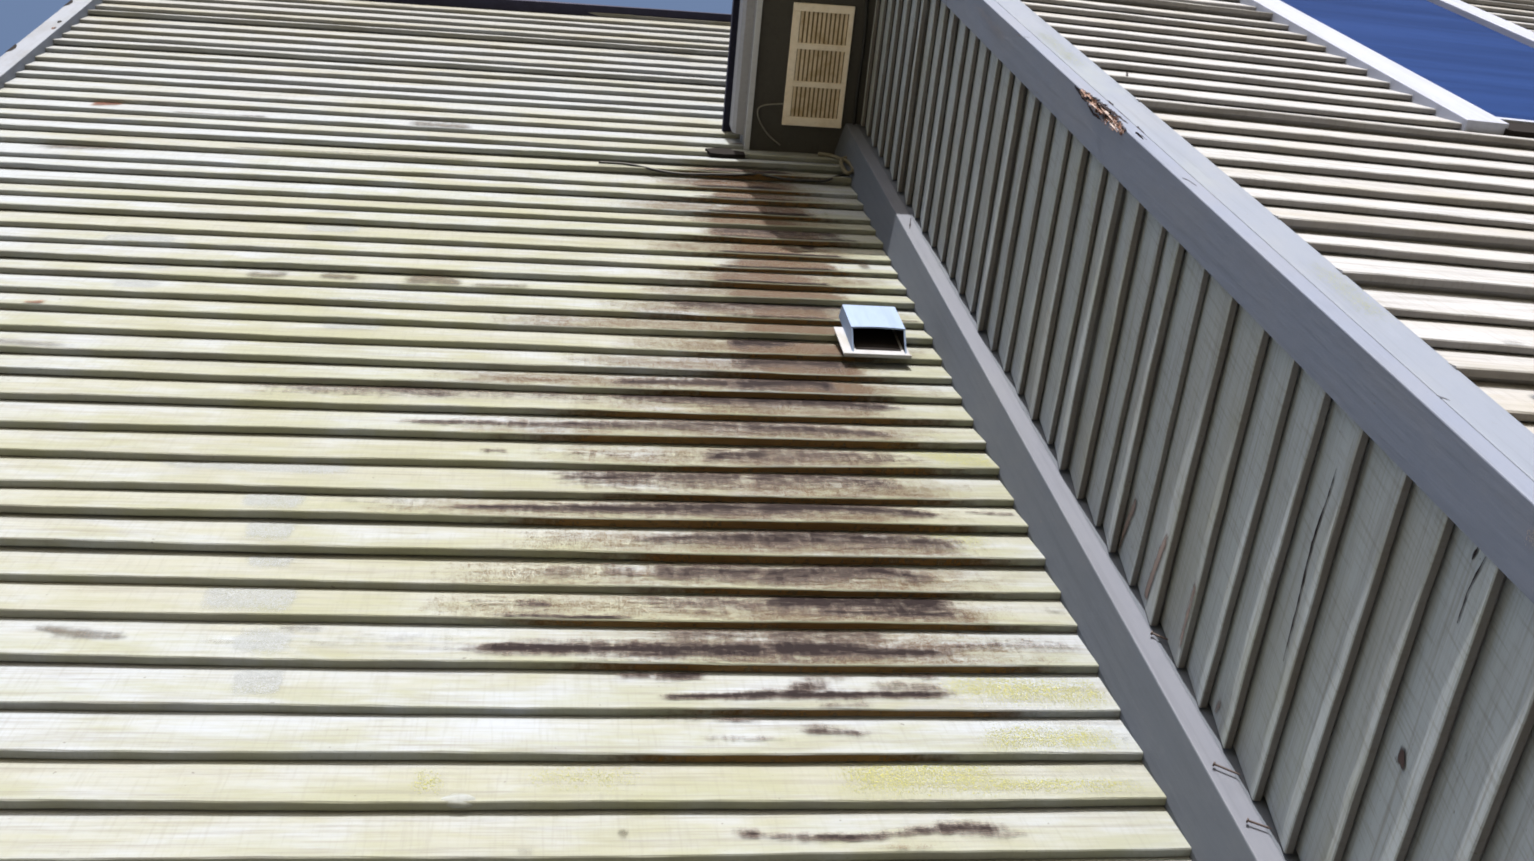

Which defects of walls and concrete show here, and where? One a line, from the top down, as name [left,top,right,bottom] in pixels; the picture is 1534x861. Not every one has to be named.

damp [112,264,171,288]
damp [298,166,1063,734]
damp [621,737,943,762]
damp [739,821,1009,849]